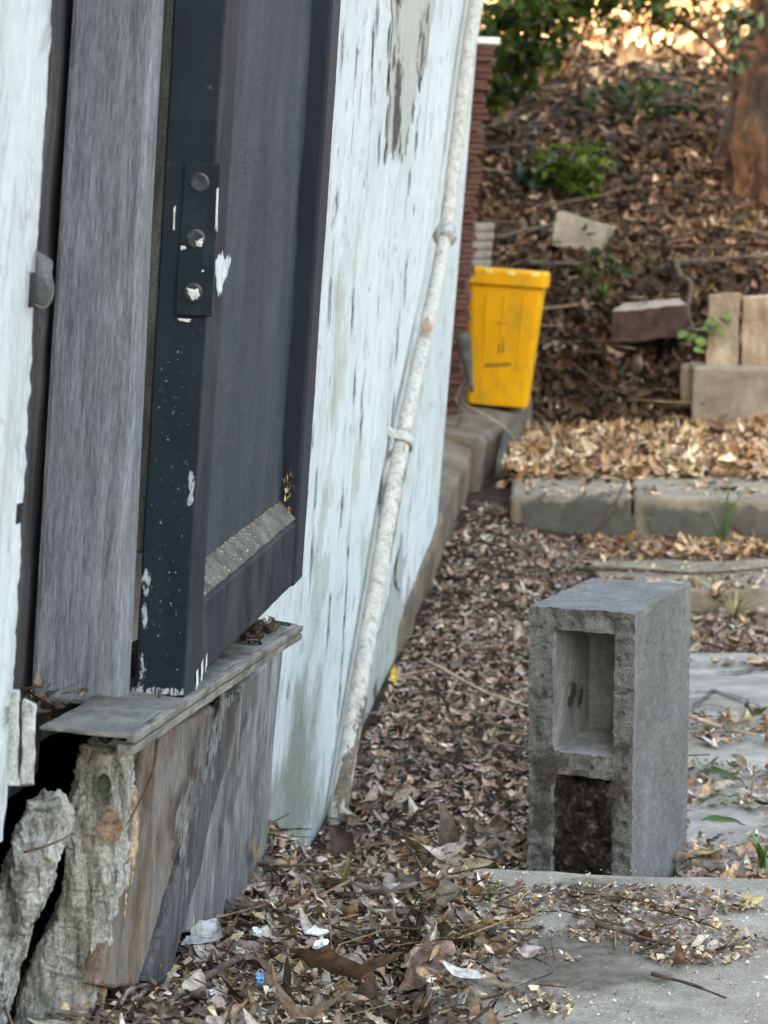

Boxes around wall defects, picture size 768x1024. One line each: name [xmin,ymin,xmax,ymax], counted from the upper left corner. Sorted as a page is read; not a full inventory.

peeling [351,0,451,187]